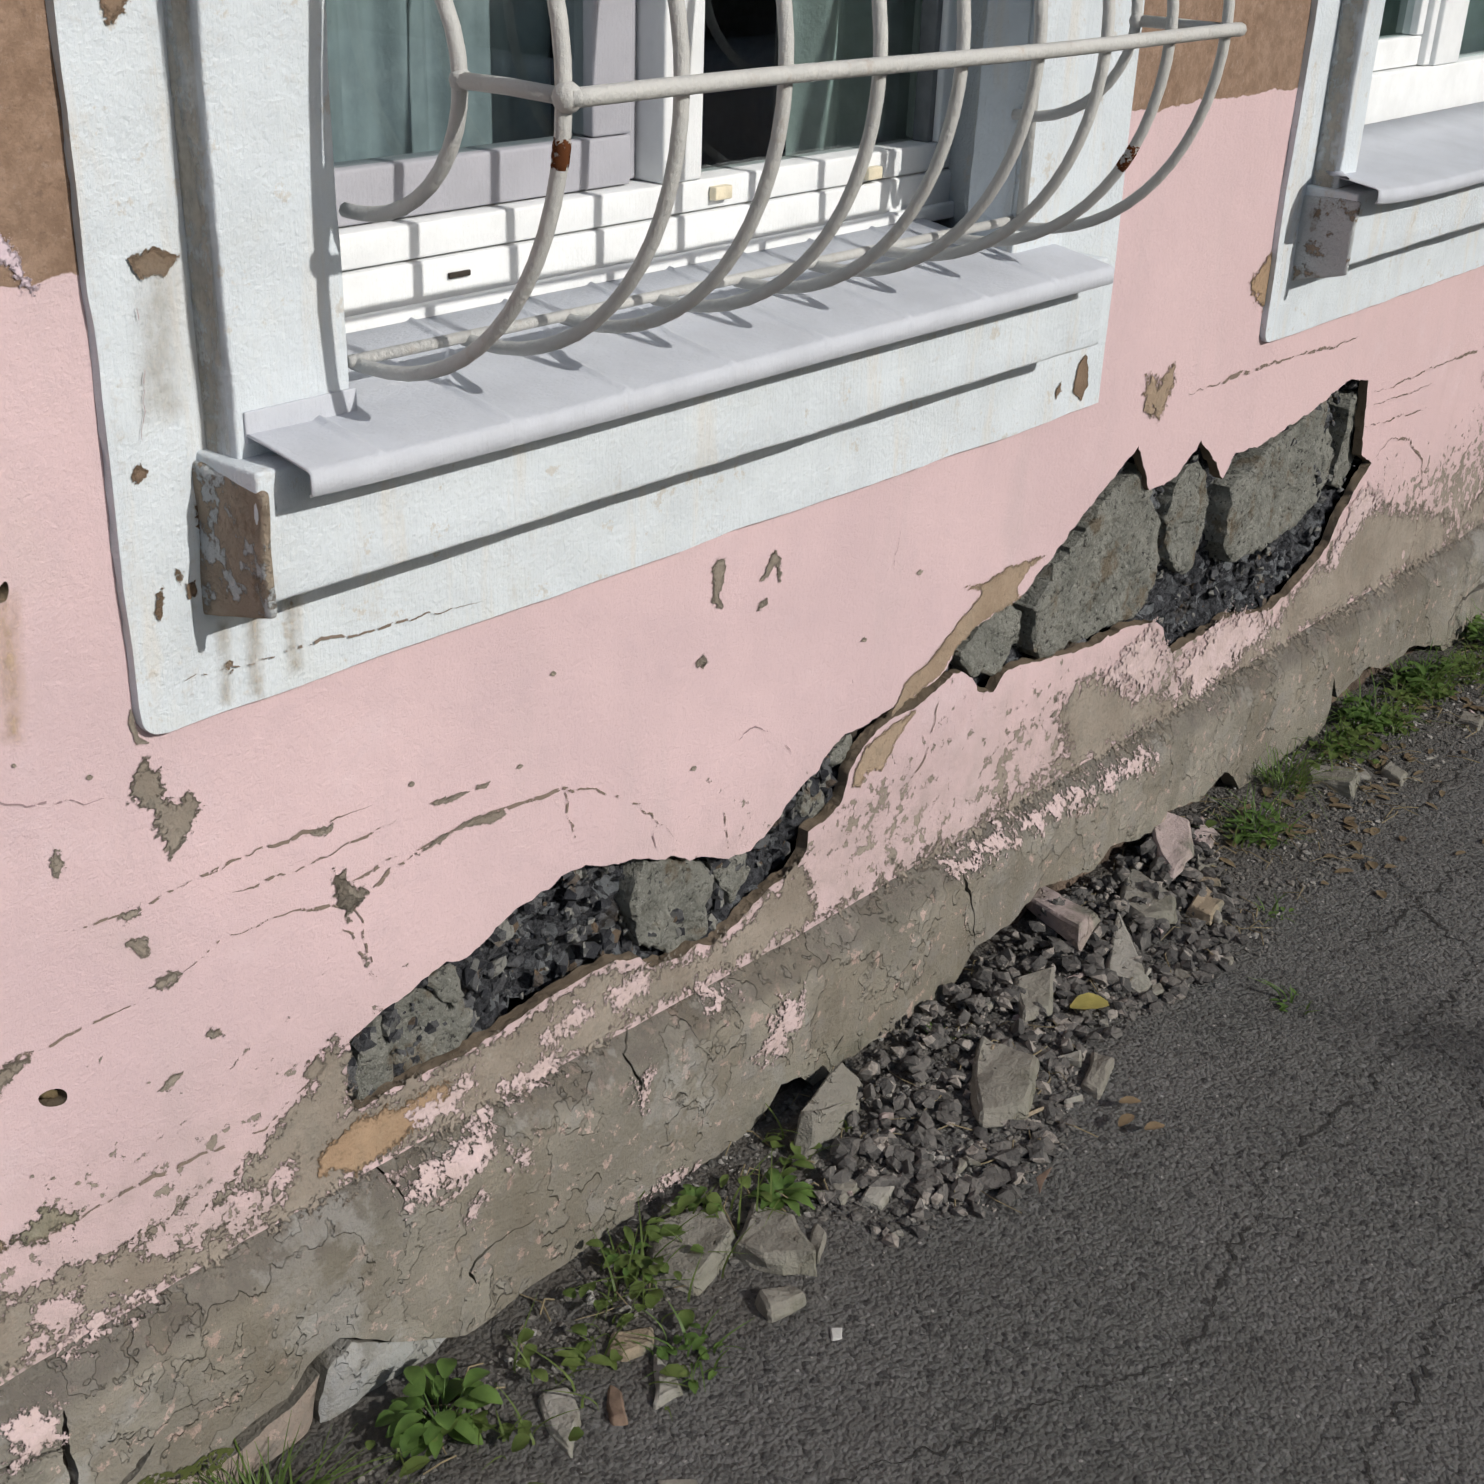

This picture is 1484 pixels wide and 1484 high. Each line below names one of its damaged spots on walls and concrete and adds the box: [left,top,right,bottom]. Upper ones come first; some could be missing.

corrosion [550,137,571,171]
corrosion [1116,145,1141,172]
spalling [127,246,180,280]
peeling [1248,252,1272,313]
spalling [1055,355,1089,401]
peeling [1142,361,1177,421]
crack [1191,338,1356,395]
crack [162,599,486,685]
crack [488,787,677,847]
spalling [0,379,1484,1392]
crack [15,805,455,1060]
crack [30,1075,320,1242]